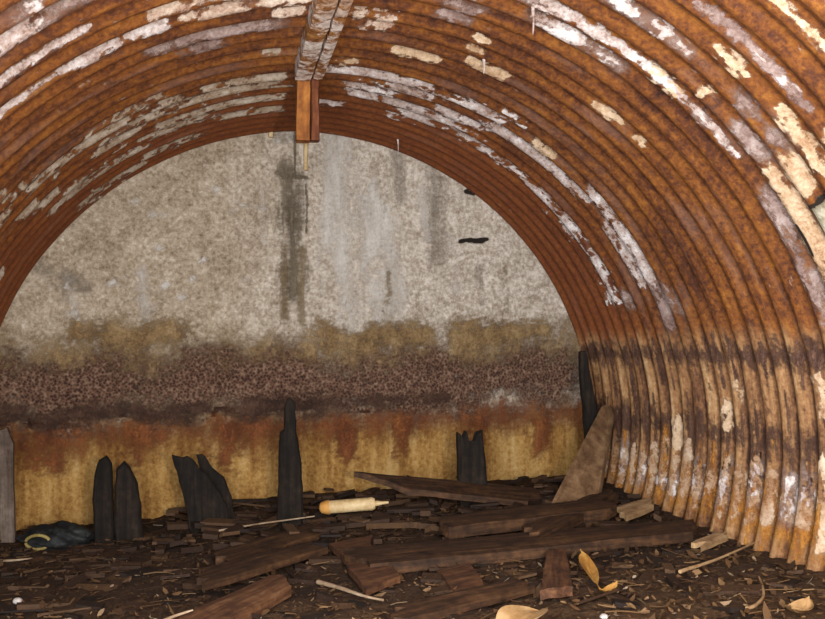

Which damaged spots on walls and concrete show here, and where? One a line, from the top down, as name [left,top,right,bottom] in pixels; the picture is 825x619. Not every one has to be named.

peeling [0,0,89,57]
water stain [0,18,172,118]
peeling [144,0,312,55]
peeling [607,0,693,59]
water stain [0,72,293,228]
water stain [319,58,657,308]
peeling [731,91,825,318]
water stain [0,134,825,492]
corrosion [0,406,284,474]
corrosion [296,393,583,464]
corrosion [604,427,821,565]
peeling [605,414,825,555]